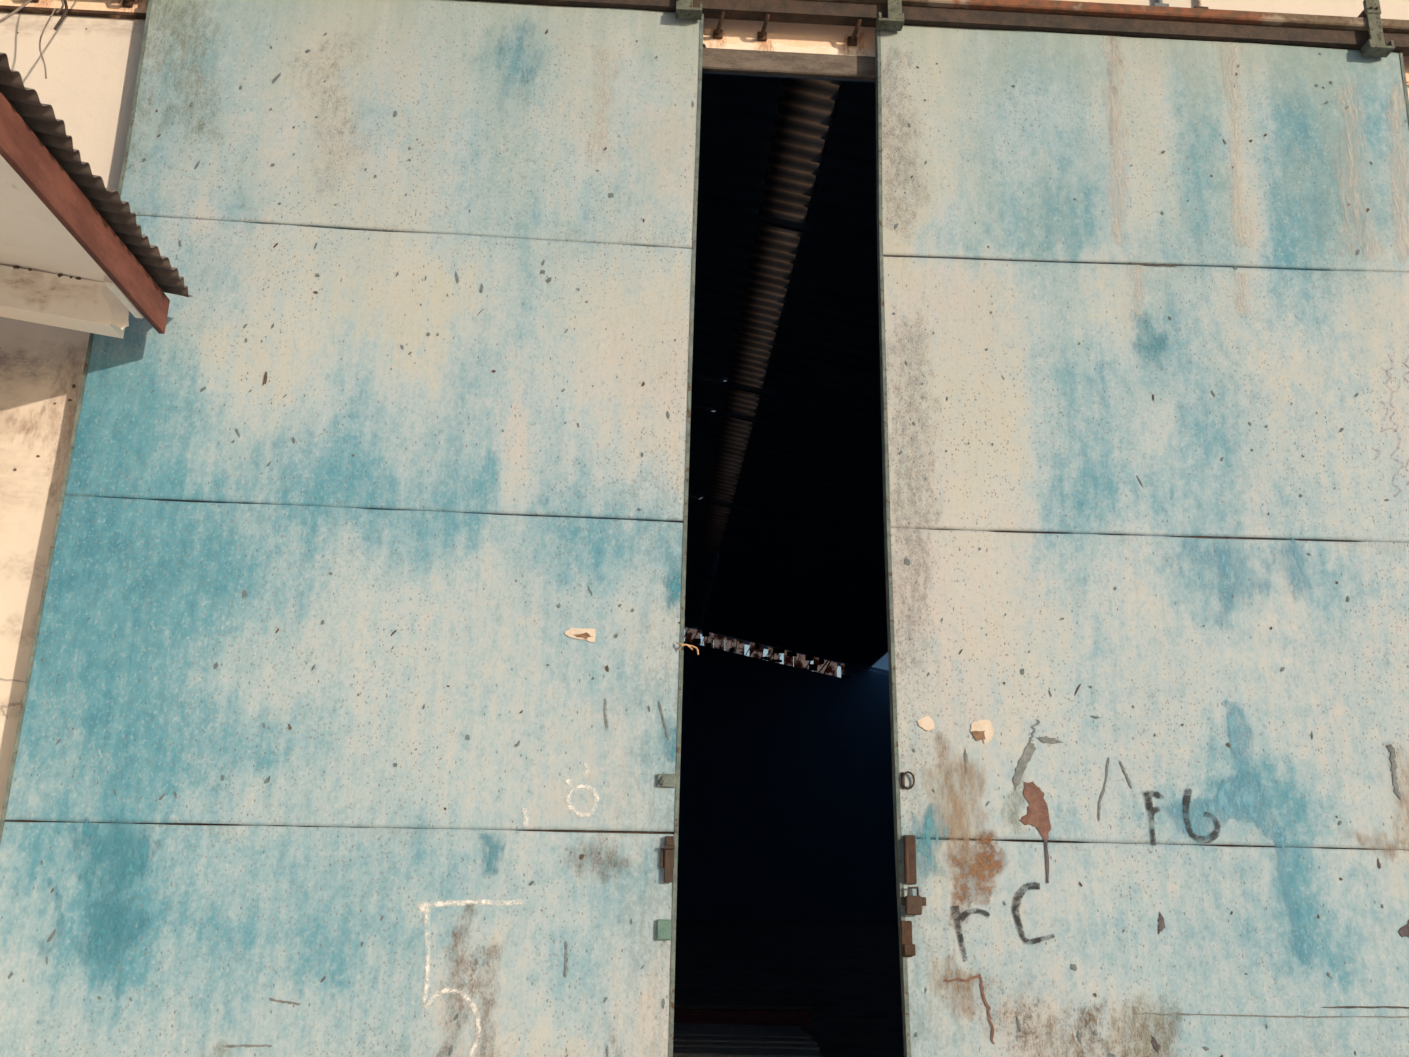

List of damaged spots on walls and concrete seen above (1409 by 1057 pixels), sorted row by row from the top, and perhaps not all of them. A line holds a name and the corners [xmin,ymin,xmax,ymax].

crack [0,678,25,719]
rust [946,763,1003,904]